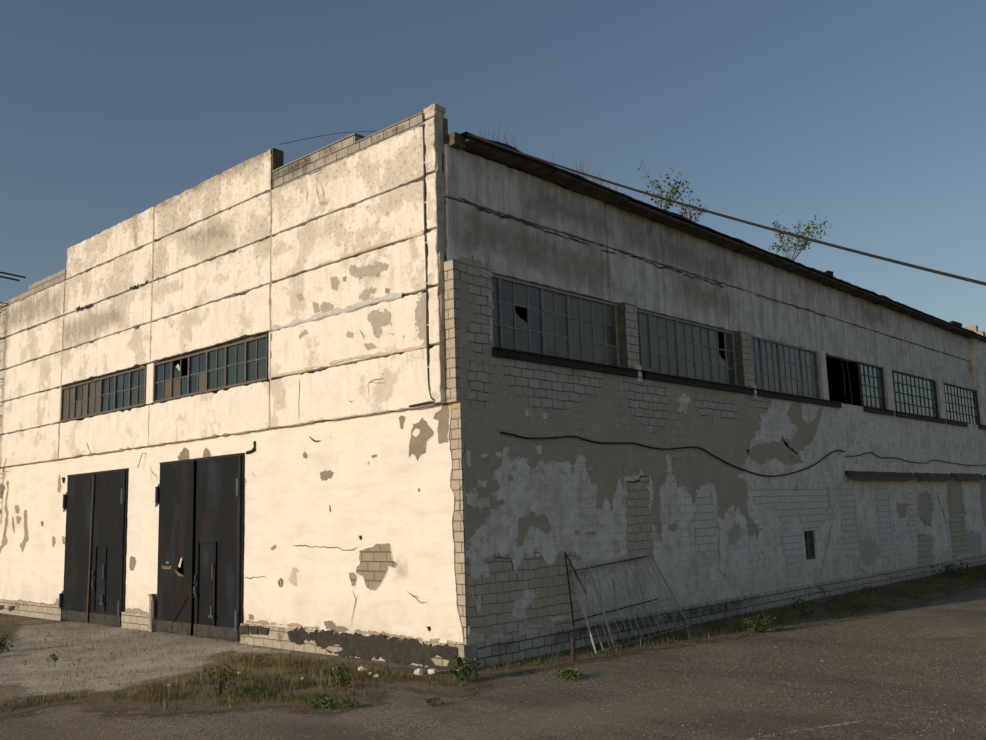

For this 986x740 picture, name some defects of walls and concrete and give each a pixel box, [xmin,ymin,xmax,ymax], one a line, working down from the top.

peeling [296,293,334,314]
peeling [330,261,392,352]
peeling [402,293,426,347]
spalling [398,403,450,462]
peeling [459,255,823,638]
spalling [0,480,29,554]
spalling [349,535,398,591]
spalling [896,491,934,565]
spalling [946,480,968,559]
spalling [0,598,59,611]